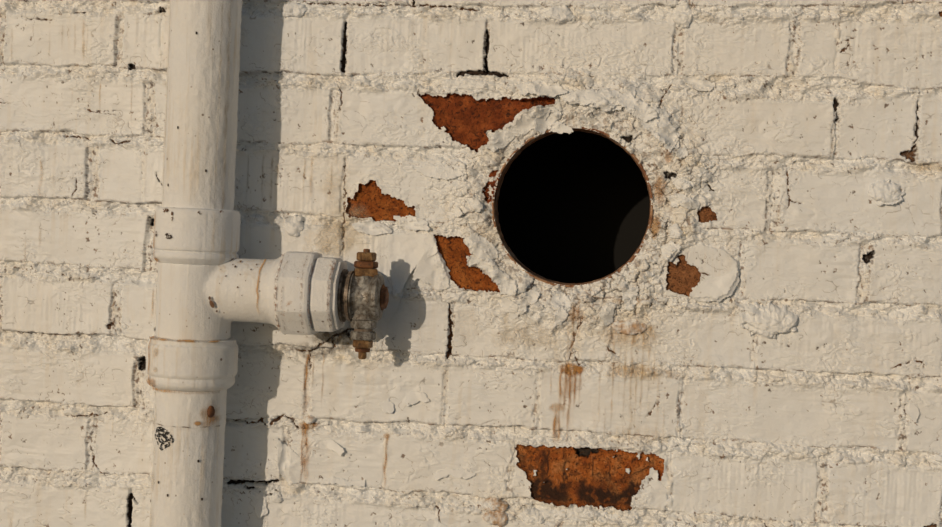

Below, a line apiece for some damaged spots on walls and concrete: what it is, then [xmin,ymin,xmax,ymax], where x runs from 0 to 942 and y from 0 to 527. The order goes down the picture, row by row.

spalling [345,79,688,326]
peeling [664,171,717,223]
peeling [660,224,740,302]
crack [296,329,350,366]
corrosion [559,363,583,398]
crack [233,415,299,428]
spalling [515,444,664,511]